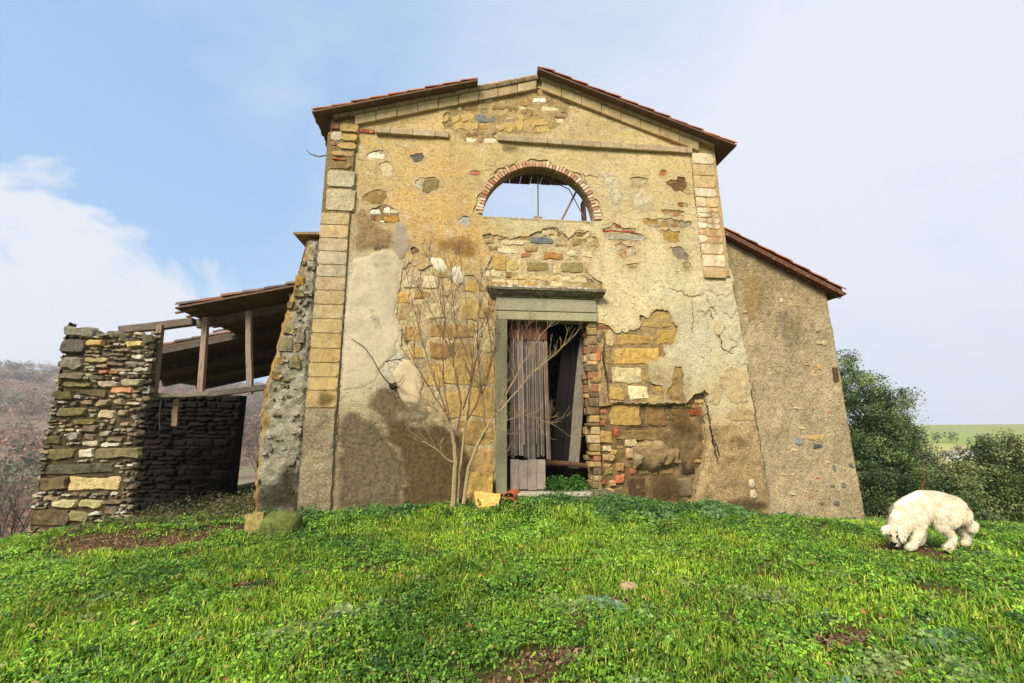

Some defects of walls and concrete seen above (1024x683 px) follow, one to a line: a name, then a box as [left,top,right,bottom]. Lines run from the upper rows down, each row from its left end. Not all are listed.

spalling [442,87,573,144]
spalling [362,190,399,223]
spalling [393,170,691,484]
crack [669,287,738,354]
spalling [586,282,754,503]
leakage [339,388,468,506]
crack [704,400,720,464]